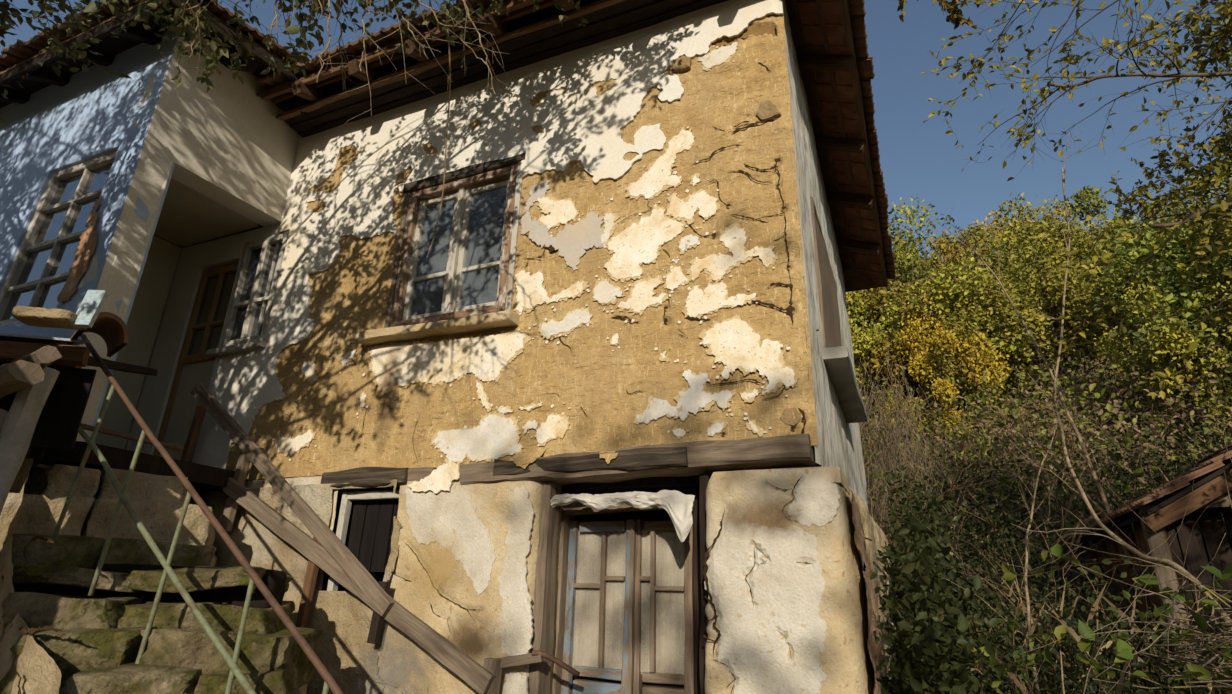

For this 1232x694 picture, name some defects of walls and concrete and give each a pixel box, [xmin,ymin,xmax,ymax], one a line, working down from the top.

flaking render [248,3,818,656]
crack [612,249,711,338]
crack [691,114,794,322]
flaking render [226,443,265,480]
peeling [501,672,528,694]
peeling [704,472,885,694]